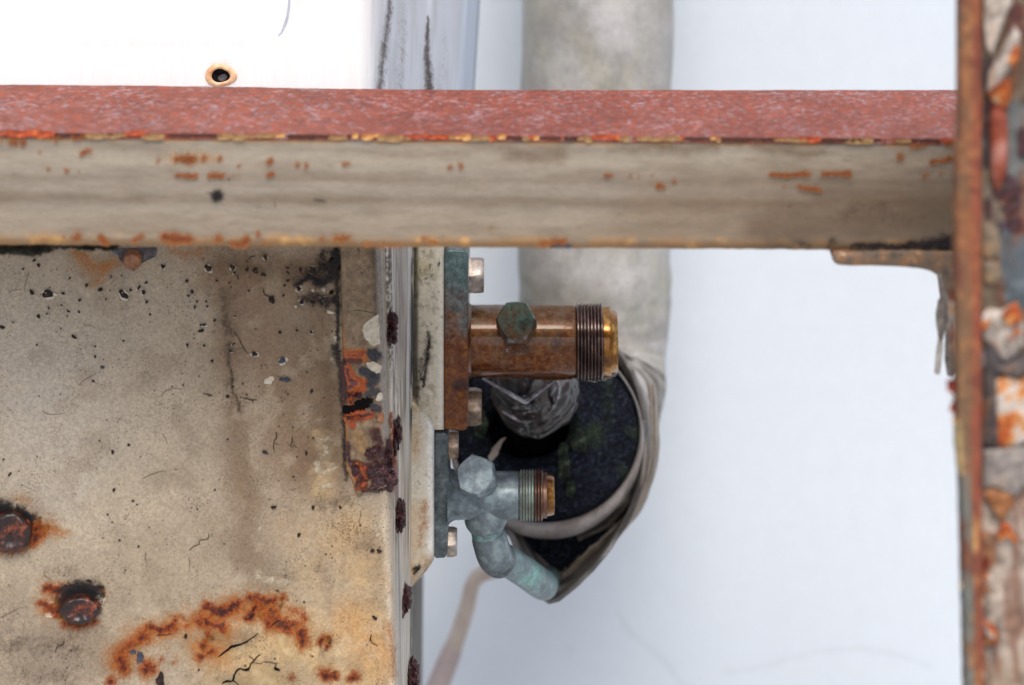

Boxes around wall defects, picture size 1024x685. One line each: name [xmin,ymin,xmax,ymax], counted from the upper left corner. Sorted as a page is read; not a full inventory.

rust [157,154,241,180]
rust [769,170,852,193]
rust [985,183,1023,233]
rust [158,231,204,258]
damp [292,247,348,481]
peeling [366,361,382,374]
peeling [375,393,384,424]
rust [0,521,66,556]
rust [36,583,99,630]
rust [105,593,332,685]
crack [218,606,290,685]
rust [318,668,360,682]